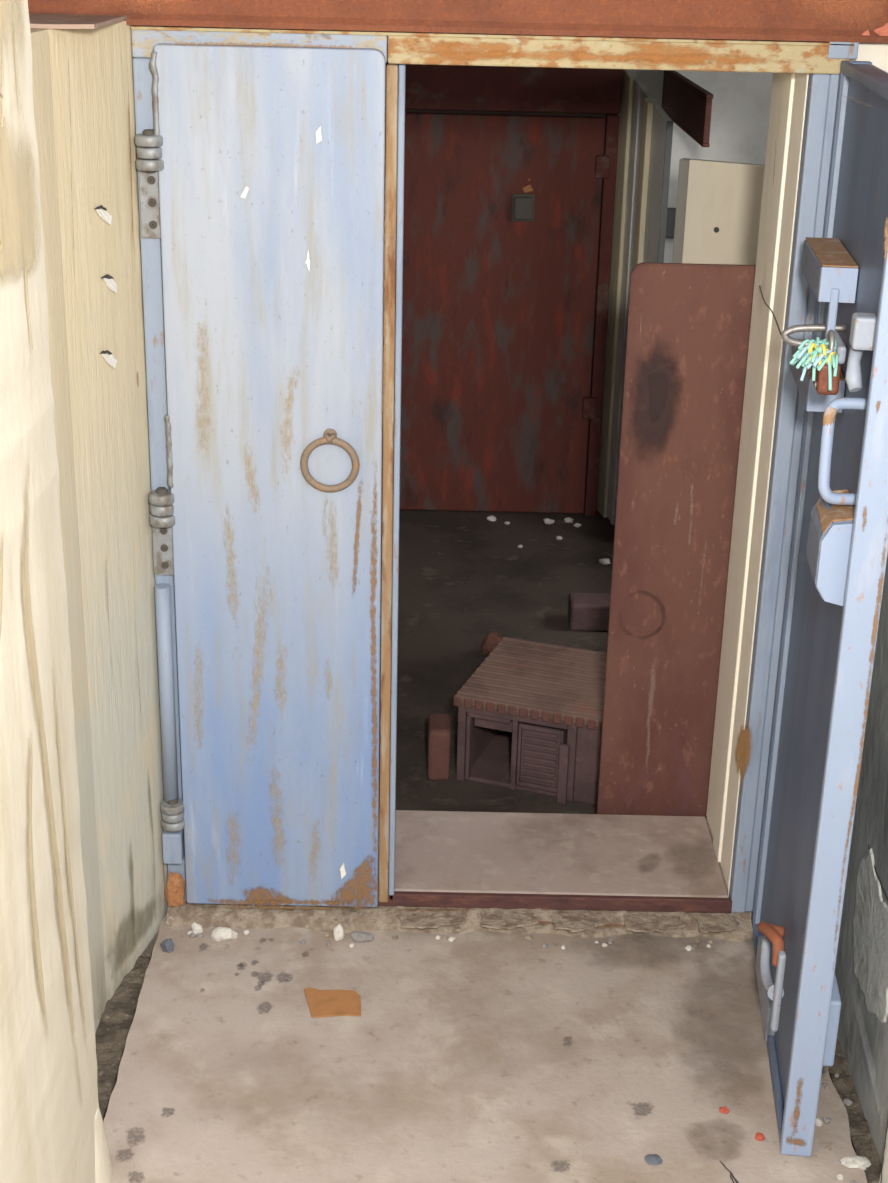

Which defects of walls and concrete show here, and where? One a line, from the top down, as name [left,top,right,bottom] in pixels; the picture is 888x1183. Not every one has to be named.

peeling [861,22,888,36]
corrosion [220,488,377,909]
corrosion [842,549,885,874]
spalling [853,848,888,1023]
crack [719,1160,739,1183]
corrosion [787,1081,804,1146]